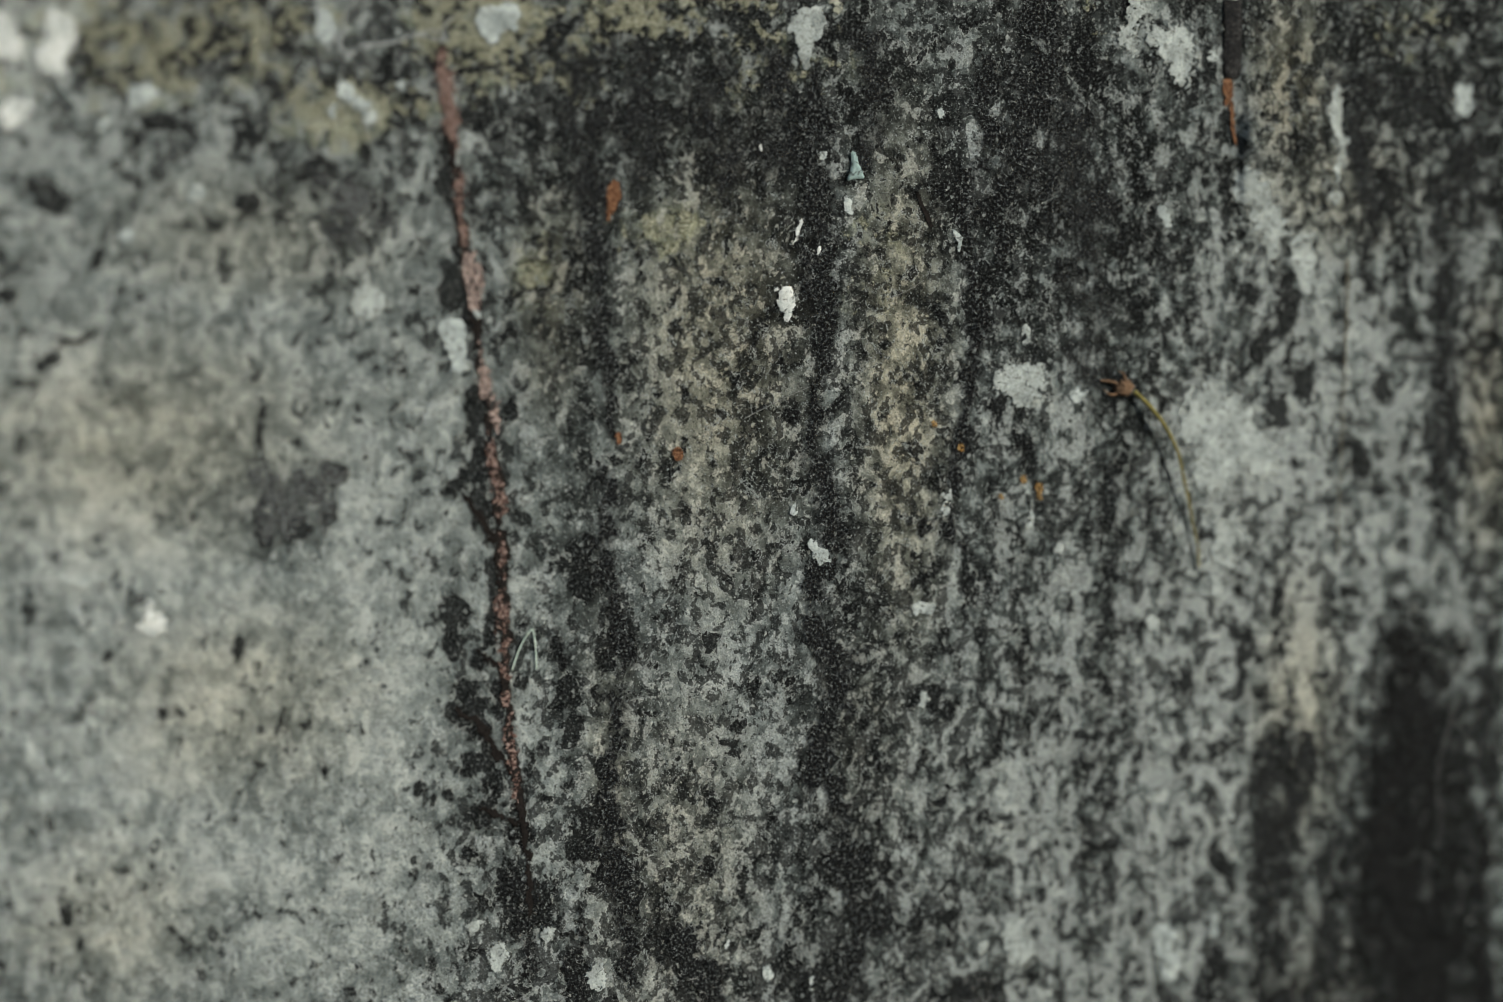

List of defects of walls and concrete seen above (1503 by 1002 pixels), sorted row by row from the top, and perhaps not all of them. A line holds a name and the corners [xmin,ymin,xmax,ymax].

crack [434,45,534,918]
damp [553,42,884,1002]
damp [857,28,895,173]
damp [942,0,1124,552]
damp [1253,736,1317,1002]
damp [1310,613,1503,1002]